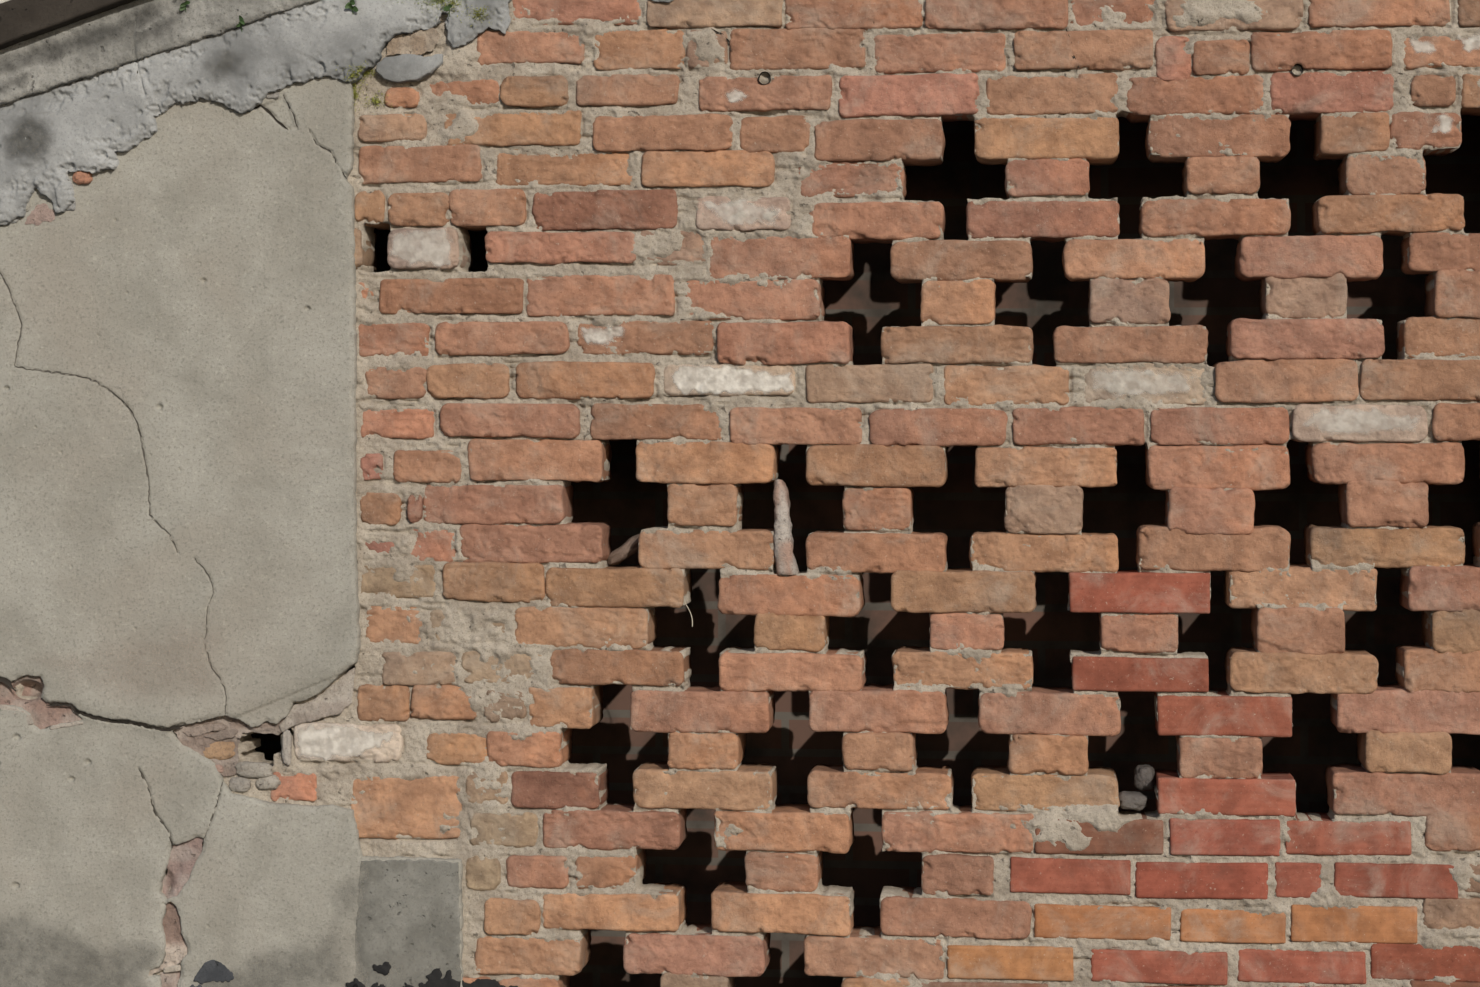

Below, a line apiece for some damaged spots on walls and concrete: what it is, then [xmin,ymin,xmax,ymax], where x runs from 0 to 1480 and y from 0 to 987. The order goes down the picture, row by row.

peeling [376,28,444,83]
crack [254,98,347,179]
spalling [10,169,111,226]
crack [0,273,227,714]
spalling [0,675,84,730]
crack [0,677,184,731]
spalling [173,668,355,792]
crack [139,770,223,848]
spalling [149,837,234,987]